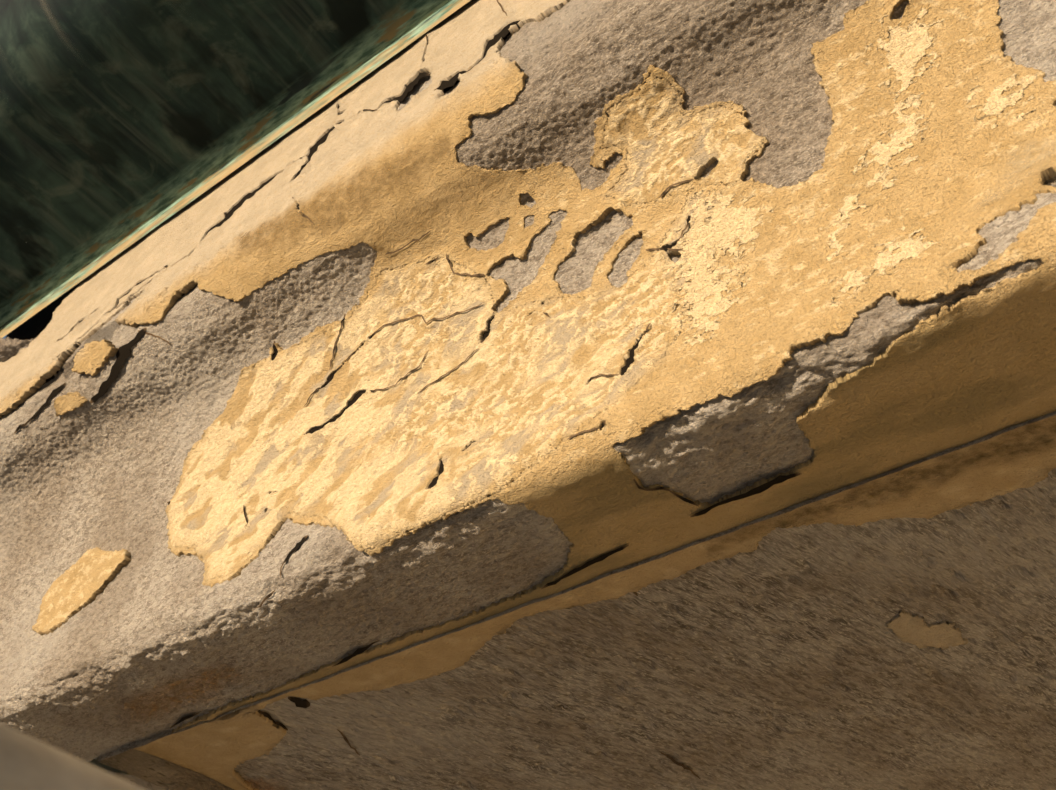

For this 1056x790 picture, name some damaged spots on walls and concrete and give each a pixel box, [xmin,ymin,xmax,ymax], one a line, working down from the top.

crack [189,0,520,256]
spalling [397,73,432,111]
spalling [455,0,869,346]
peeling [819,1,945,261]
spalling [966,0,1056,129]
crack [14,382,66,433]
crack [90,328,170,403]
spalling [0,242,573,762]
crack [303,304,495,435]
crack [428,441,475,489]
crack [587,323,651,384]
spalling [613,177,1056,504]